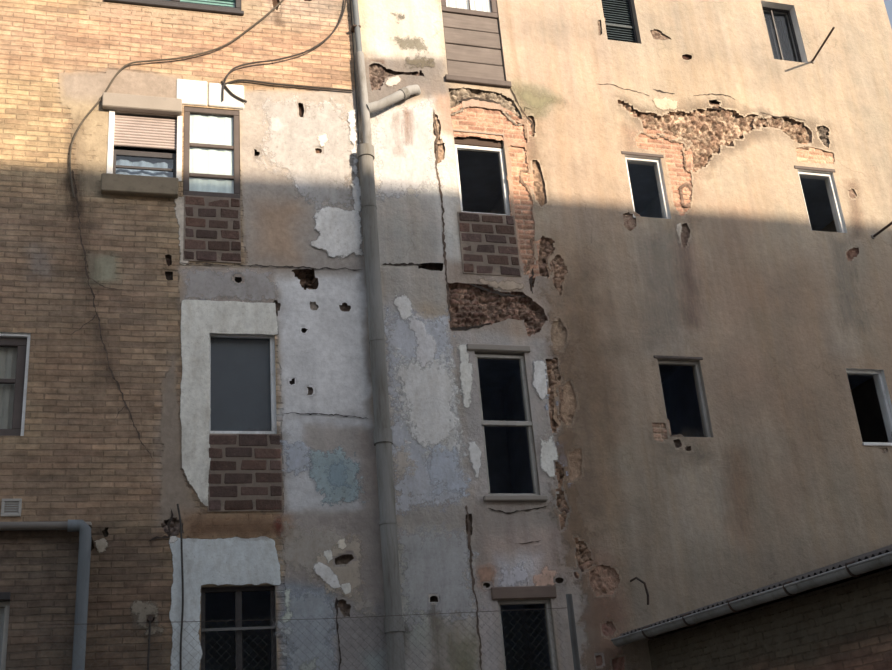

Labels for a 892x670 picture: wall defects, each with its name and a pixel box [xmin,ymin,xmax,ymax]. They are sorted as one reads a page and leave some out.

peeling [263,100,363,259]
flaking render [369,63,425,91]
peeling [373,99,443,200]
crack [433,112,452,322]
flaking render [618,97,835,247]
crack [71,170,152,458]
peeling [384,104,582,530]
peeling [280,440,366,506]
peeling [278,534,363,670]
peeling [397,514,479,632]
crack [465,505,482,670]
peeling [499,562,556,587]